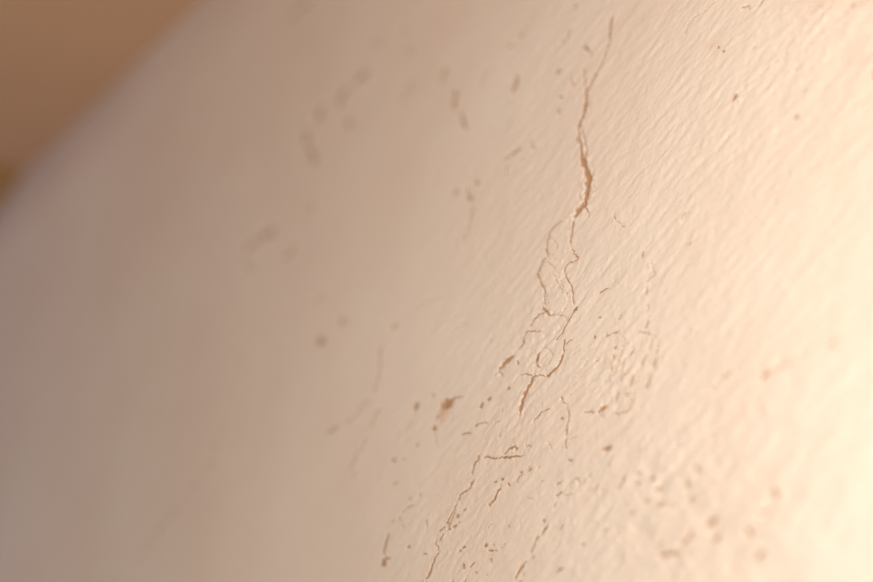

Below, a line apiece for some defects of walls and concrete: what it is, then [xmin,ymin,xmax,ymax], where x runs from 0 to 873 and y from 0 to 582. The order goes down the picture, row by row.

crack [564,16,613,304]
flaking render [499,221,578,415]
crack [561,396,573,462]
crack [426,445,523,579]
crack [515,519,548,582]